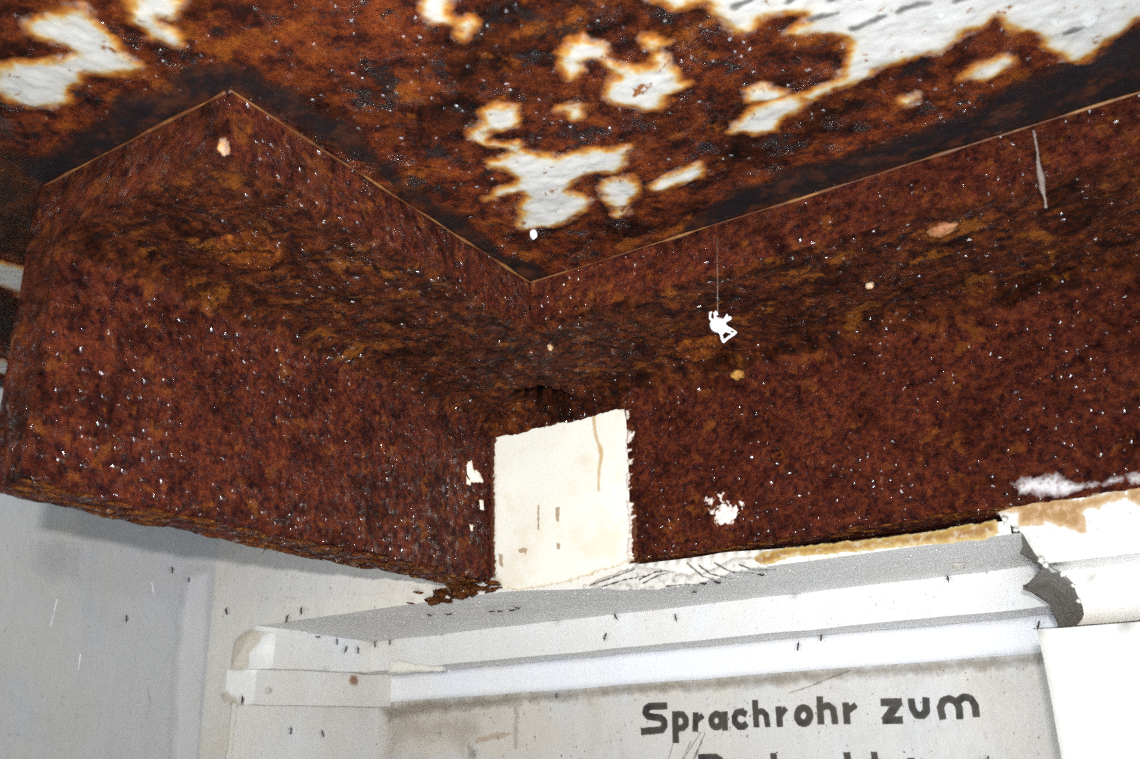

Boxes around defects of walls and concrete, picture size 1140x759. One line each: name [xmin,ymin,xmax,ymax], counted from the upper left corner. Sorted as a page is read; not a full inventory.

peeling [0,0,148,111]
peeling [120,0,189,49]
peeling [416,0,483,43]
peeling [551,30,695,123]
peeling [644,0,1140,137]
peeling [464,100,708,231]
corrosion [926,221,959,238]
peeling [0,260,24,298]
corrosion [406,437,502,606]
peeling [493,409,1086,628]
corrosion [1000,488,1140,533]
water stain [1015,472,1140,497]